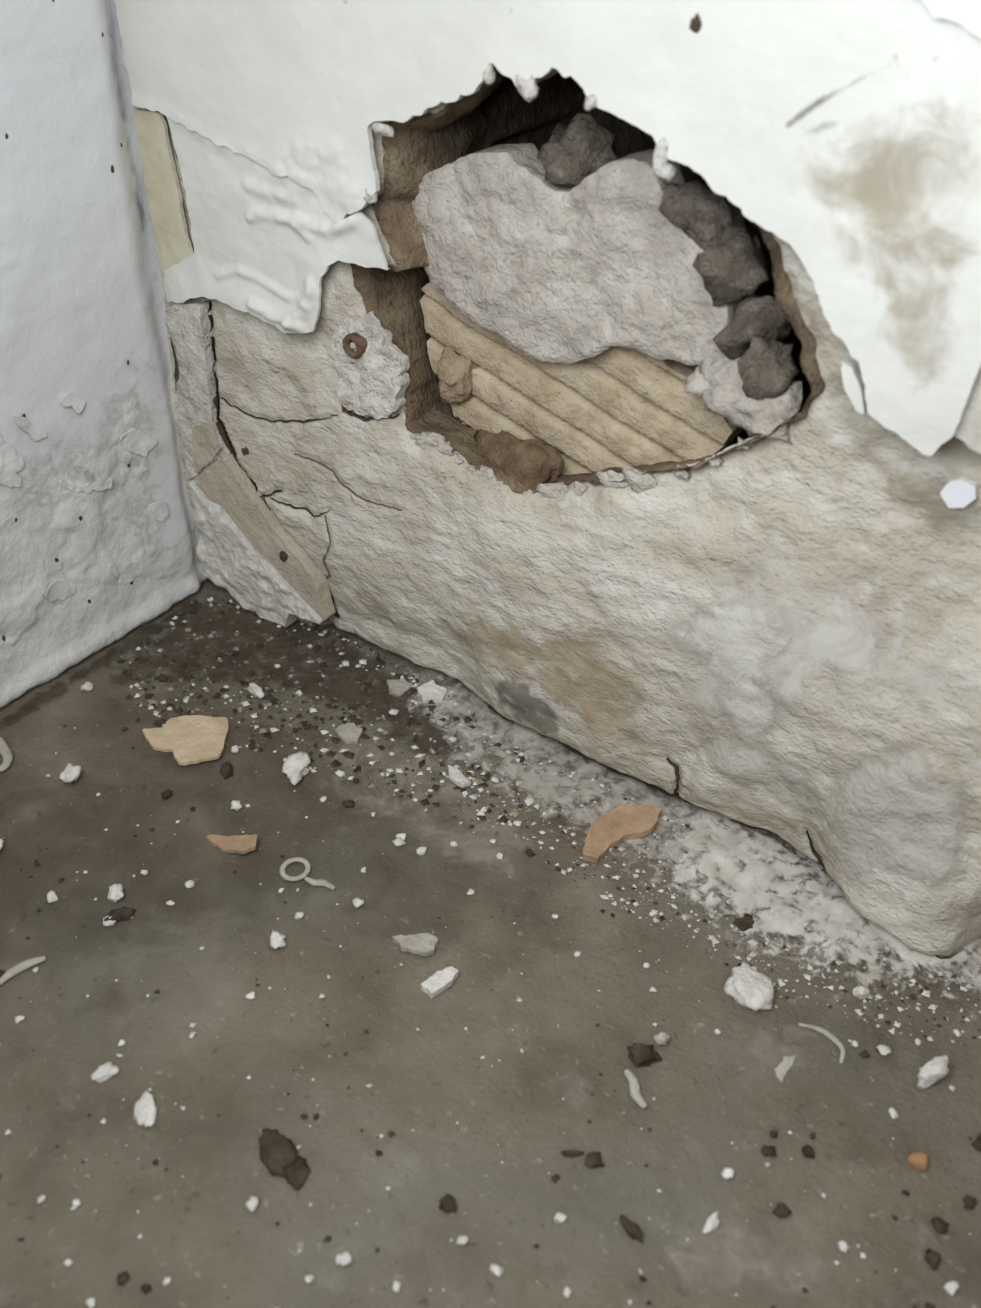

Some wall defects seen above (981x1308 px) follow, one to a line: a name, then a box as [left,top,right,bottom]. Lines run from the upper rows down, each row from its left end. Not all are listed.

leakage [827,146,906,228]
peeling [115,0,981,499]
crack [165,299,403,618]
peeling [940,477,978,508]
peeling [0,392,203,708]
leakage [725,597,882,702]
leakage [495,681,557,734]
spalling [59,763,82,785]